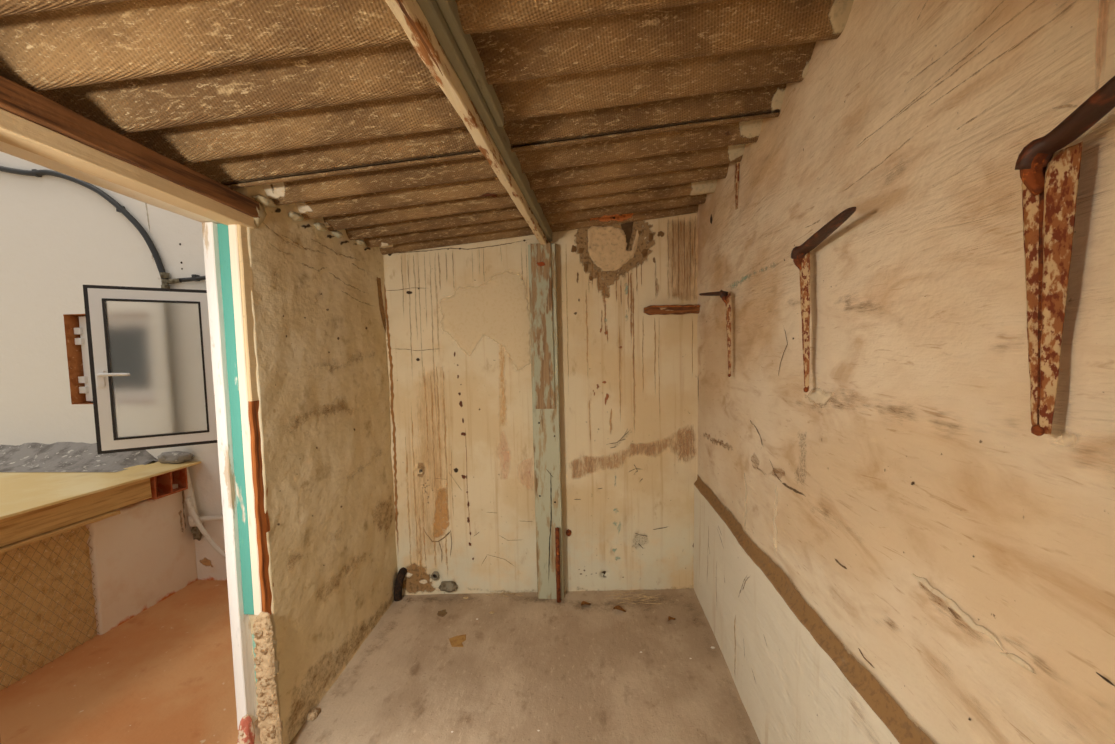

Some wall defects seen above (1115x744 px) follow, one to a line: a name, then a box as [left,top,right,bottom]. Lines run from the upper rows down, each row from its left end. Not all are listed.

flaking render [571,220,664,298]
water stain [573,428,730,478]
water stain [408,485,453,568]
flaking render [402,563,440,593]
spalling [252,612,282,744]